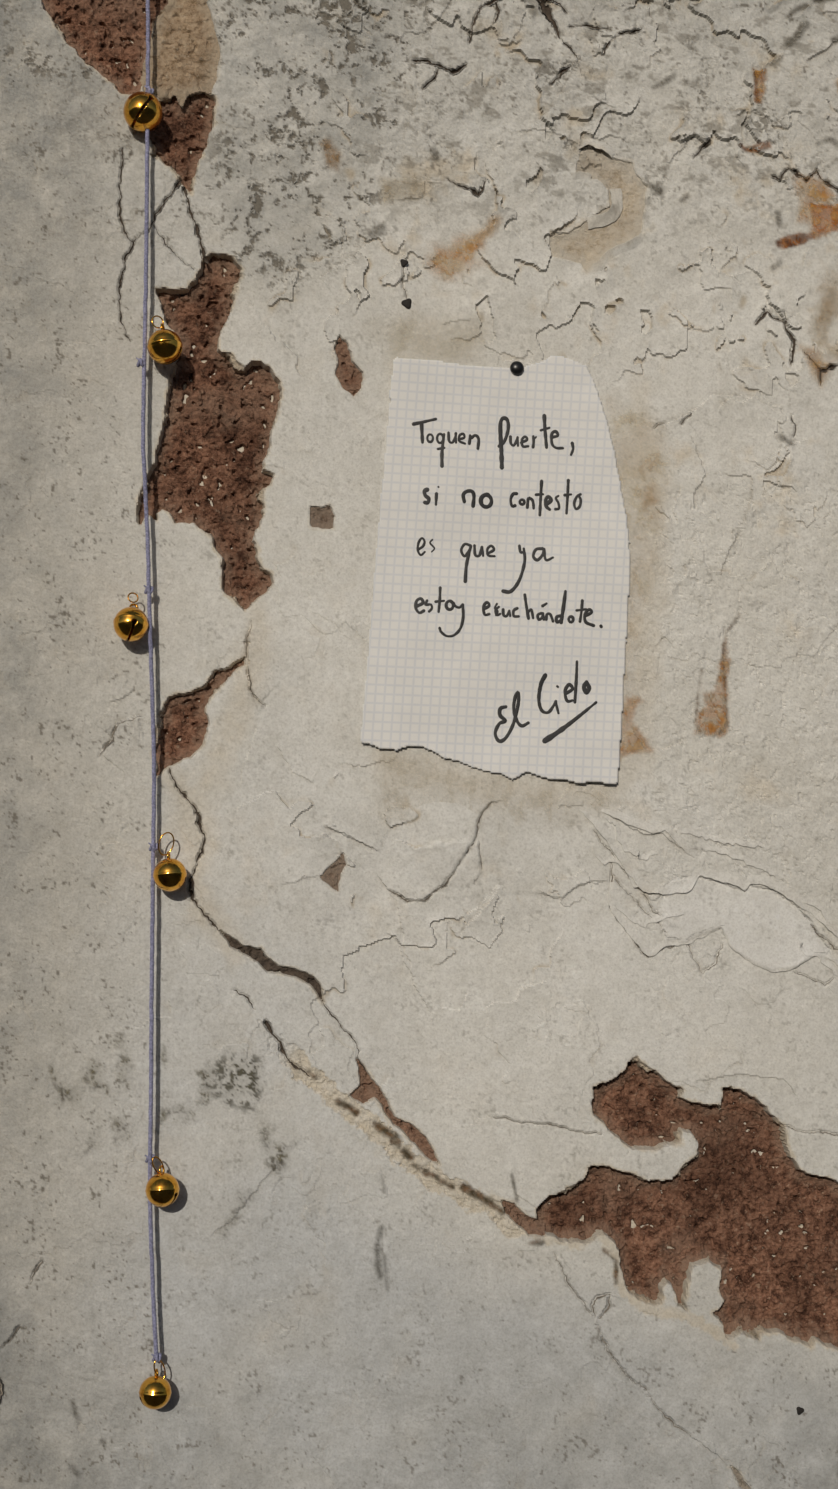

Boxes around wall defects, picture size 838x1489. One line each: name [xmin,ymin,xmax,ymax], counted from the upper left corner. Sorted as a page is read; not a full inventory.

spalling [42,0,168,95]
spalling [150,93,215,192]
rust [777,180,838,248]
spalling [138,256,280,609]
spalling [156,660,244,776]
crack [169,768,219,931]
crack [390,804,490,902]
crack [235,990,309,1076]
crack [323,1003,365,1070]
spalling [351,1059,438,1162]
spalling [502,1062,838,1347]
crack [556,1259,691,1436]